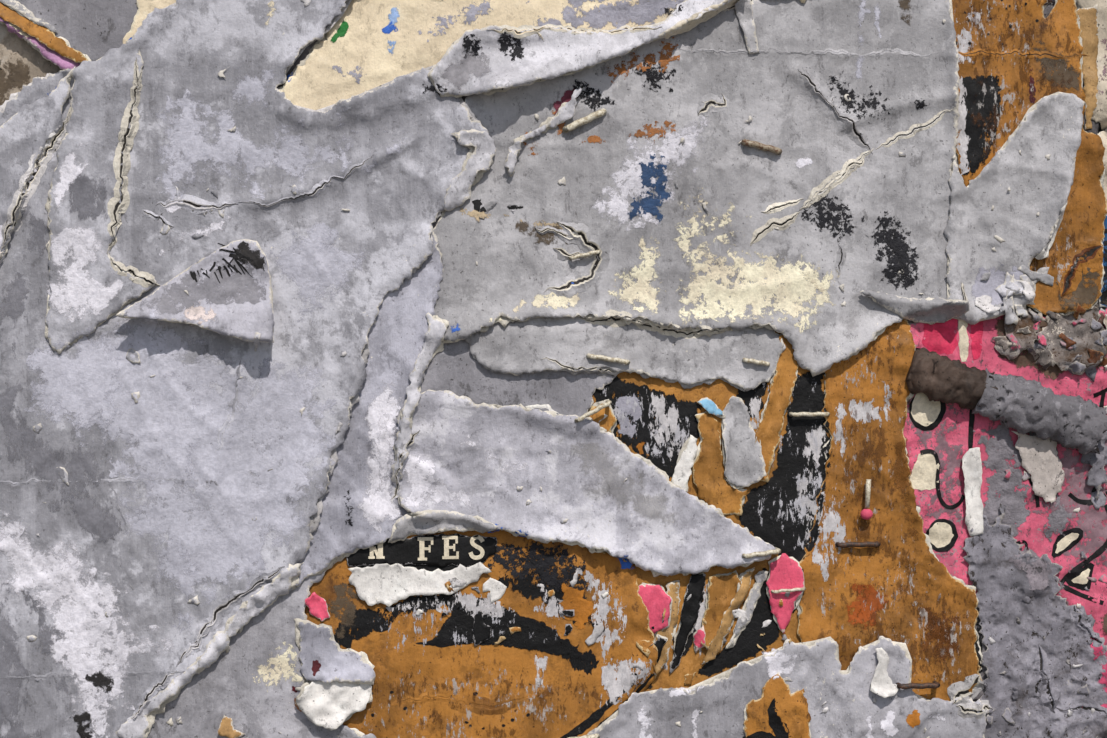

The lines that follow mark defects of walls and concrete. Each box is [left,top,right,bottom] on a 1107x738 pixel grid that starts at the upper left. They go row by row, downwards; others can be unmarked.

crack [107,57,374,288]
crack [535,221,731,339]
crack [487,24,1088,246]
crack [0,566,285,721]